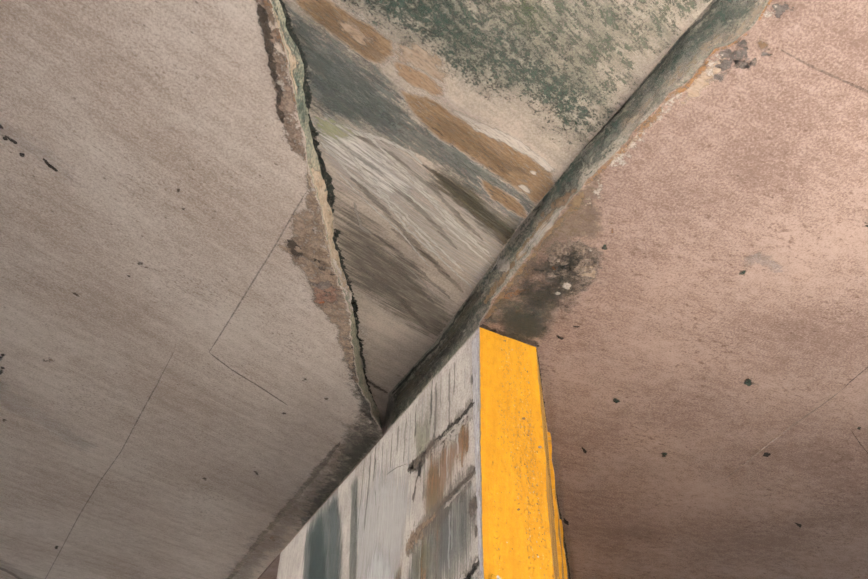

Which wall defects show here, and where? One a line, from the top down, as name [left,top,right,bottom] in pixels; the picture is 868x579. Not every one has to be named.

peeling [609,39,771,167]
peeling [764,2,794,18]
crack [781,50,864,90]
spalling [255,0,358,383]
crack [279,0,388,405]
water stain [294,0,736,579]
spalling [520,240,603,308]
crack [210,353,287,405]